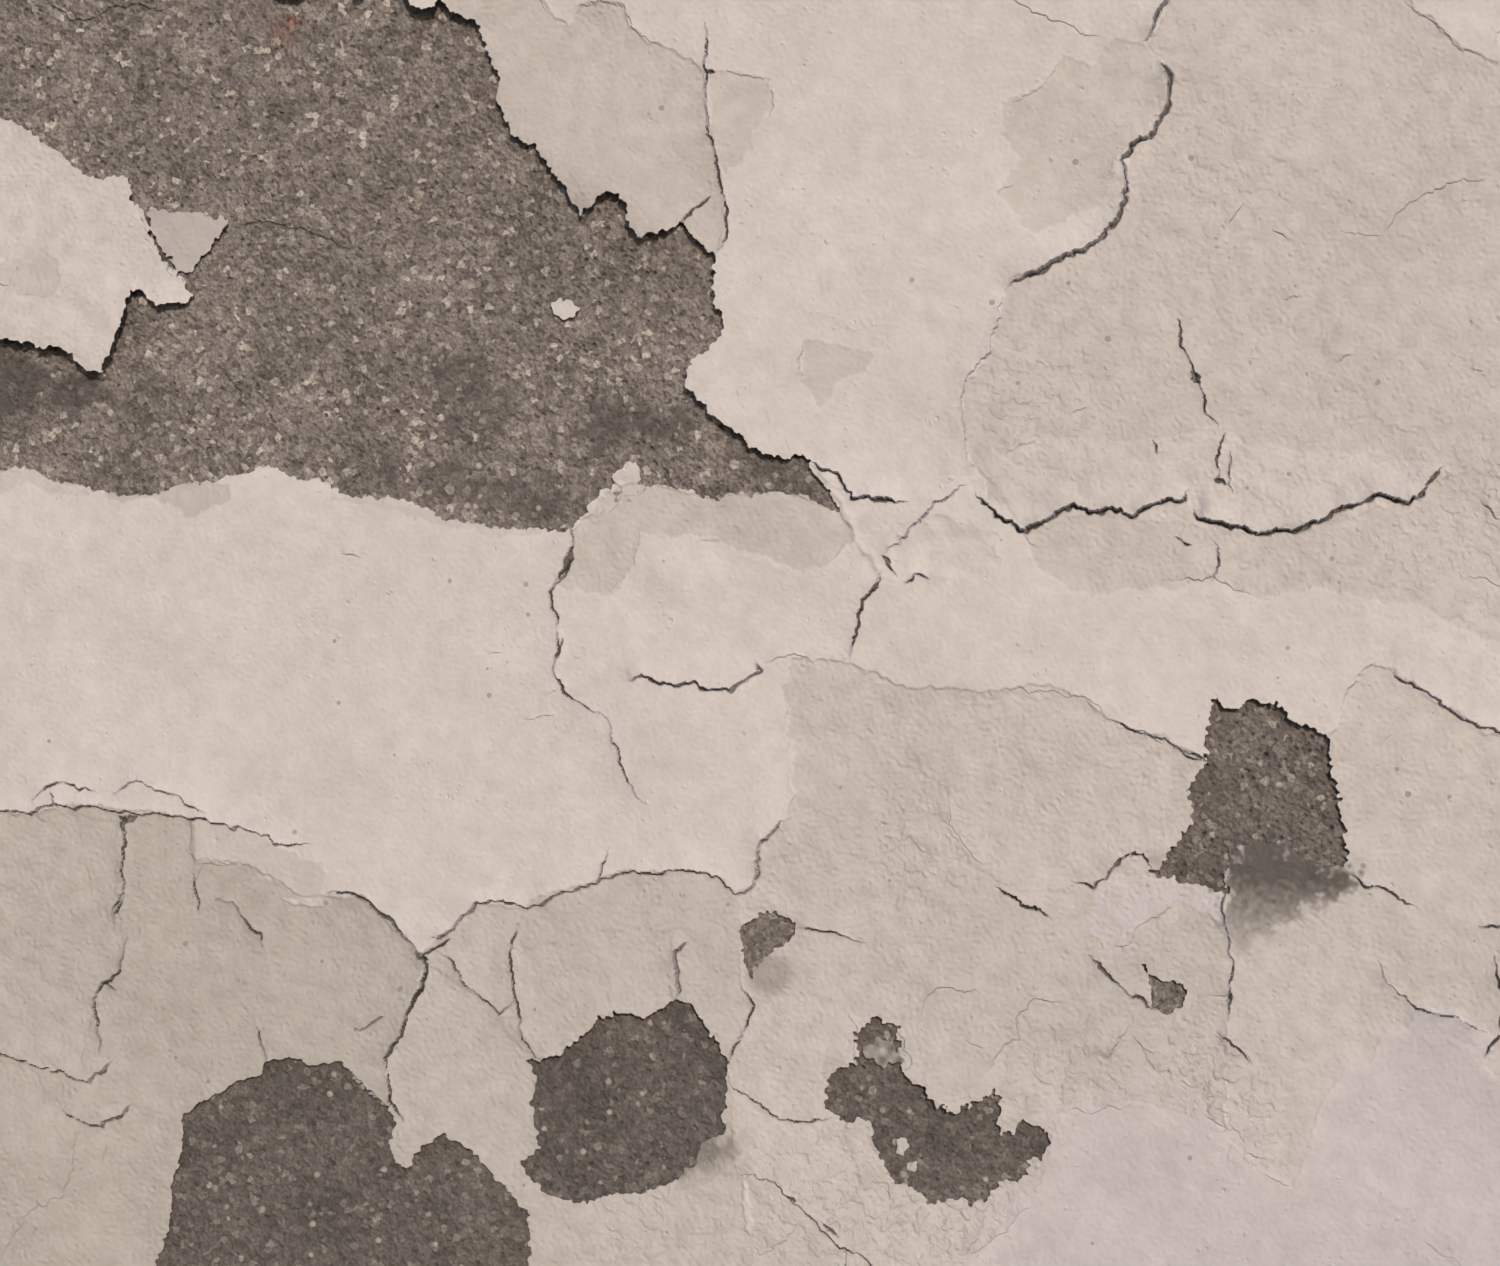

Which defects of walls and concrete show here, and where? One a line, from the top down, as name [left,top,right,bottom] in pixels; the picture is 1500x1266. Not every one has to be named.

crack [682,125,729,241]
peeling [0,0,913,596]
peeling [960,0,1500,645]
crack [549,530,589,710]
peeling [616,648,763,693]
crack [852,556,927,646]
crack [43,782,199,913]
crack [336,891,536,1115]
peeling [0,657,1500,1266]
crack [1093,960,1152,1009]
crack [1220,896,1247,1059]
crack [1397,964,1500,1054]